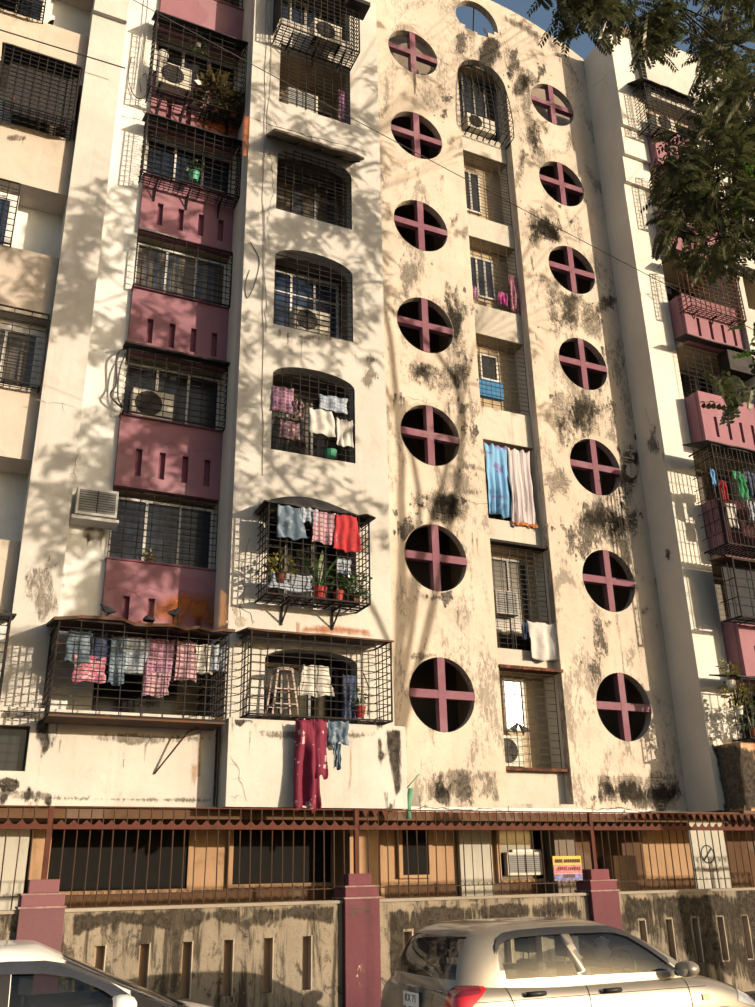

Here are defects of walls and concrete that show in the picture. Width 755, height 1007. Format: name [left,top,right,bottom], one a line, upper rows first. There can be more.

water stain [456,28,551,197]
water stain [522,205,573,249]
water stain [543,284,617,353]
water stain [545,382,659,561]
water stain [393,487,481,540]
corrosion [158,594,224,627]
water stain [4,701,53,757]
water stain [424,769,499,809]
water stain [591,771,682,812]
water stain [73,909,239,935]
water stain [253,905,334,926]
water stain [625,892,755,984]